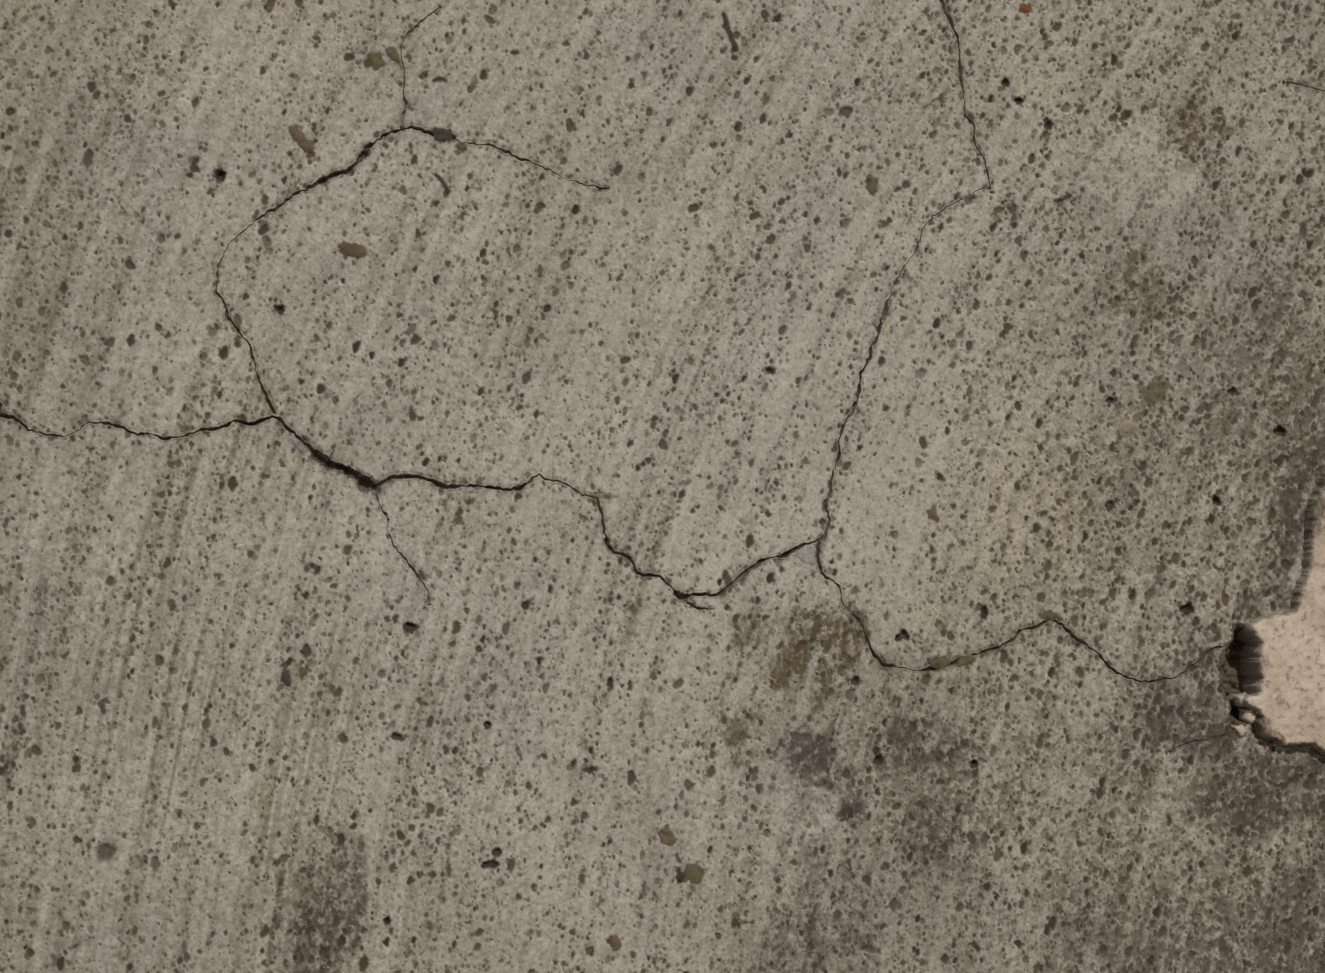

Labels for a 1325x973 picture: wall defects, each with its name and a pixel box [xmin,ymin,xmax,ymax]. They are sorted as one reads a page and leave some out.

crack [0,0,1226,685]
peeling [1231,692,1257,737]